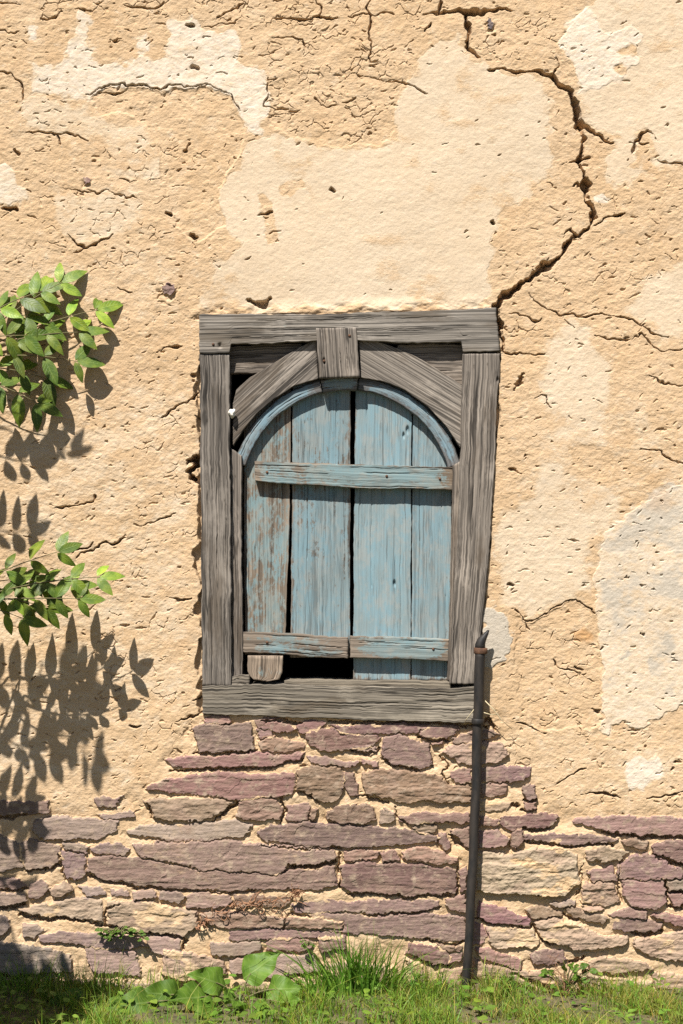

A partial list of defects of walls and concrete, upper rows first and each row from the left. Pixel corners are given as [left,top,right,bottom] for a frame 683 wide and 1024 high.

crack [0,2,93,35]
crack [124,1,165,10]
crack [199,2,245,28]
crack [273,0,429,108]
crack [0,70,24,101]
crack [85,76,290,111]
crack [26,130,89,145]
flaking render [21,0,683,315]
crack [422,0,683,635]
crack [72,343,203,722]
flaking render [494,318,683,736]